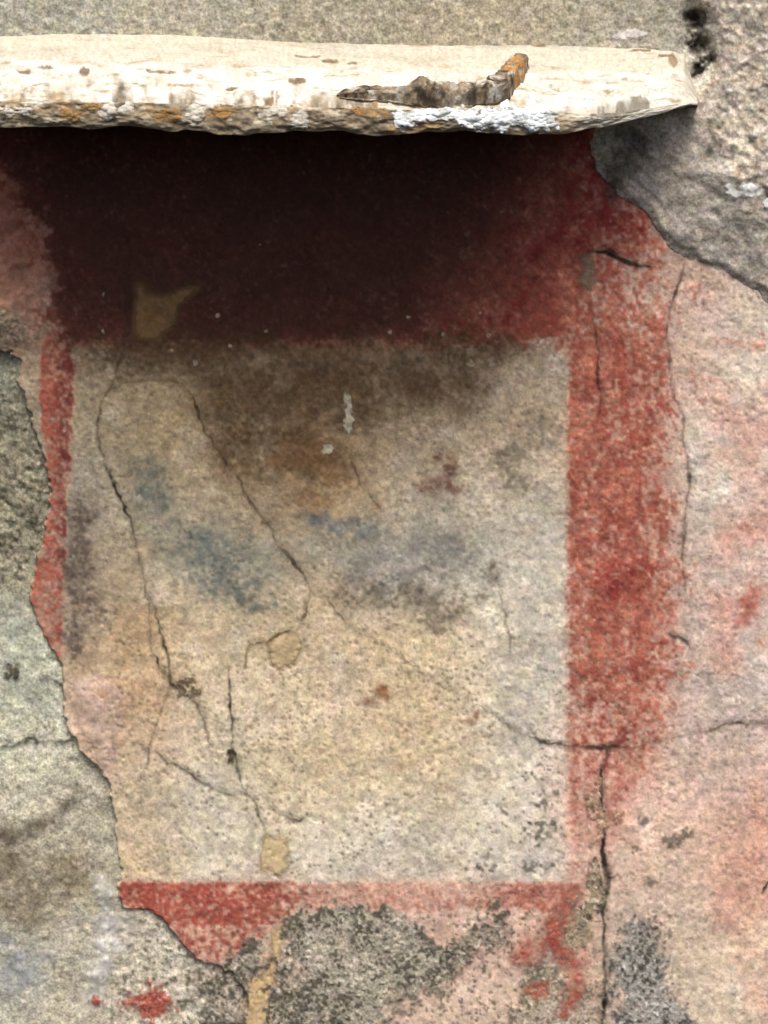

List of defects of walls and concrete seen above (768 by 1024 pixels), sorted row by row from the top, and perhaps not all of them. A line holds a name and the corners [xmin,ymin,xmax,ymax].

crack [595,249,651,267]
crack [108,471,131,518]
crack [281,548,304,574]
crack [256,602,340,644]
crack [668,633,689,645]
flaking render [4,663,19,679]
crack [156,620,198,708]
crack [227,679,235,726]
crack [159,754,303,822]
crack [533,737,625,1024]
flaking render [508,778,698,1024]
flaking render [185,894,515,1024]